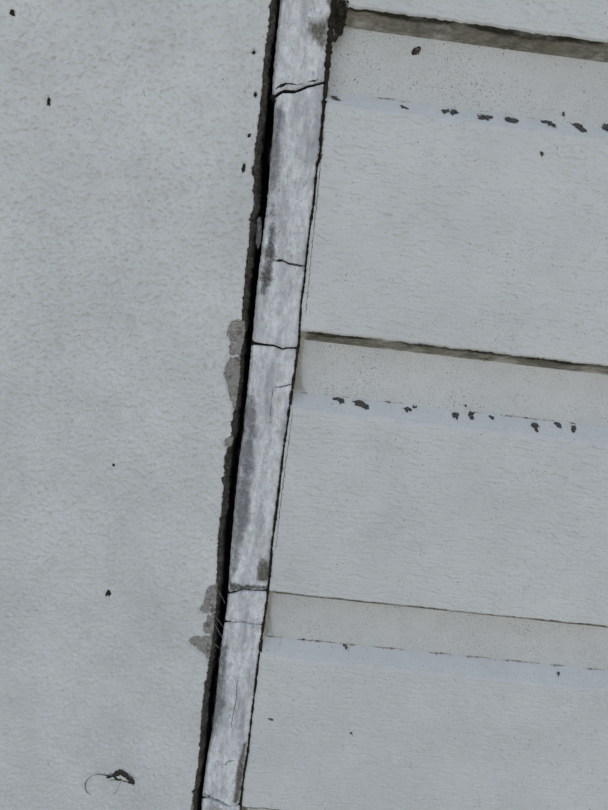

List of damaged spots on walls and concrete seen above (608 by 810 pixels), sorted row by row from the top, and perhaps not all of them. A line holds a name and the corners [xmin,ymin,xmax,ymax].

peeling [562,112,587,133]
spalling [189,0,280,810]
crack [223,0,336,810]
peeling [332,396,369,410]
peeling [451,404,475,420]